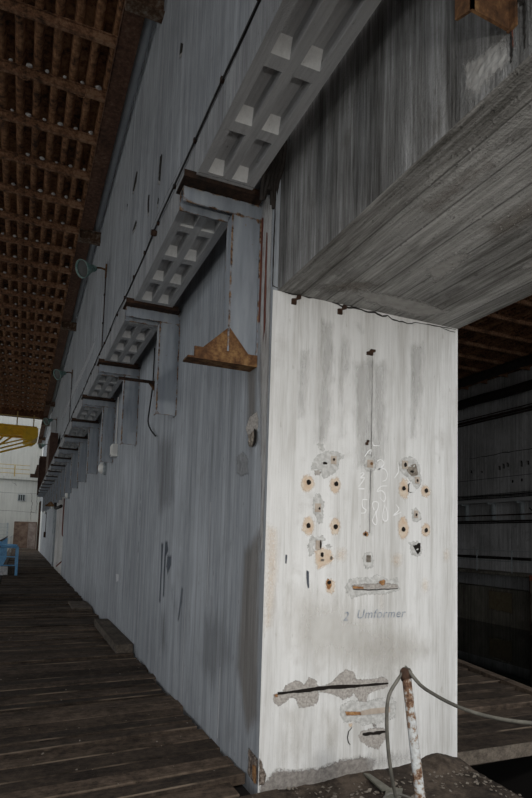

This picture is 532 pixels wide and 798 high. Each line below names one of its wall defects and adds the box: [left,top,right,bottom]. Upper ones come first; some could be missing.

spalling [246,412,259,447]
spalling [311,444,344,479]
spalling [399,456,422,493]
spalling [312,494,324,524]
peeling [308,535,333,569]
spalling [410,541,422,557]
spalling [344,552,399,598]
peeling [273,669,396,749]
spalling [423,765,522,797]